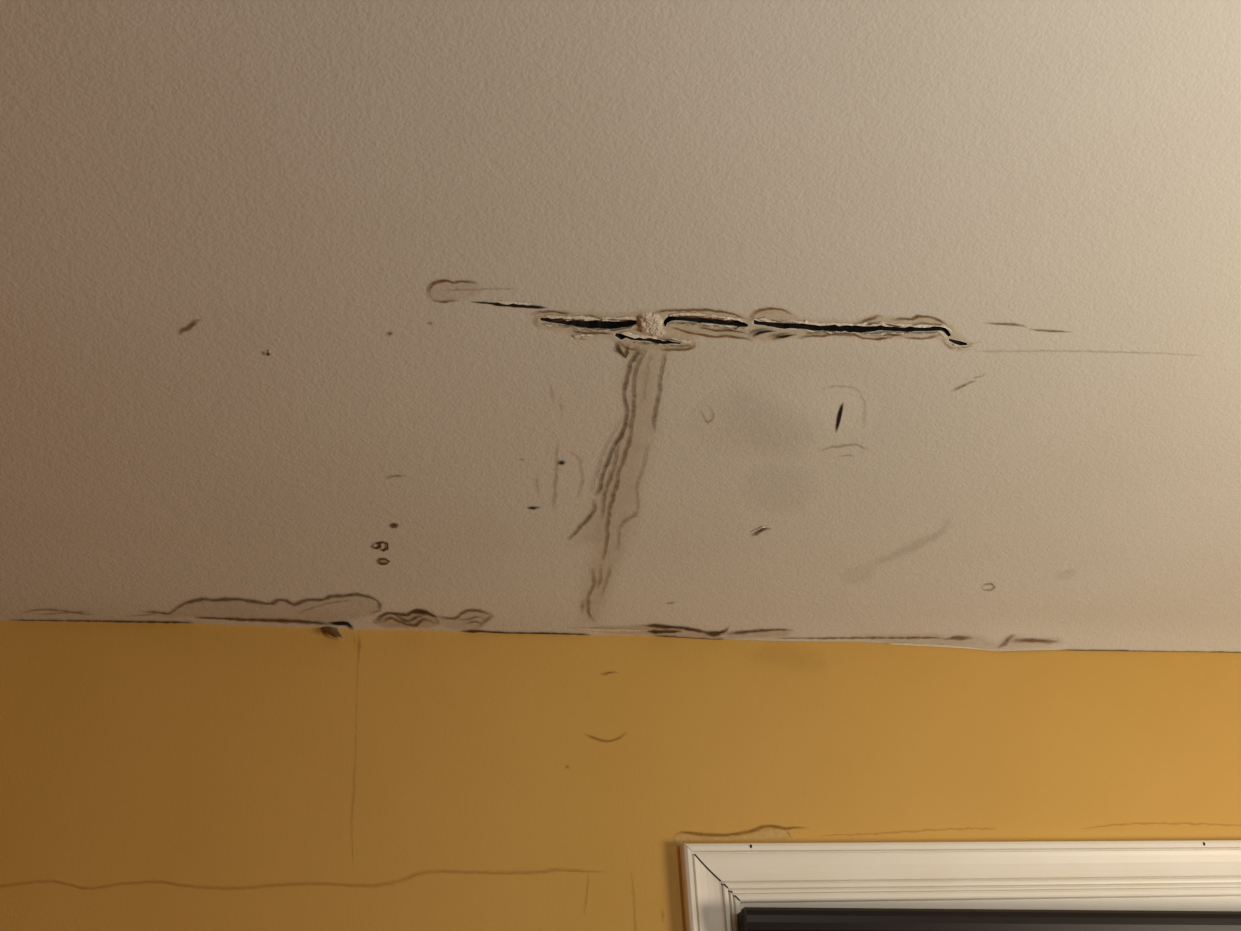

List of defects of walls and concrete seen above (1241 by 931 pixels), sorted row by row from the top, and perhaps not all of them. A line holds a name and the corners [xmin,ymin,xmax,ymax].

crack [475,300,972,349]
water stain [804,315,944,340]
crack [993,323,1064,332]
water stain [654,309,747,422]
water stain [536,311,645,554]